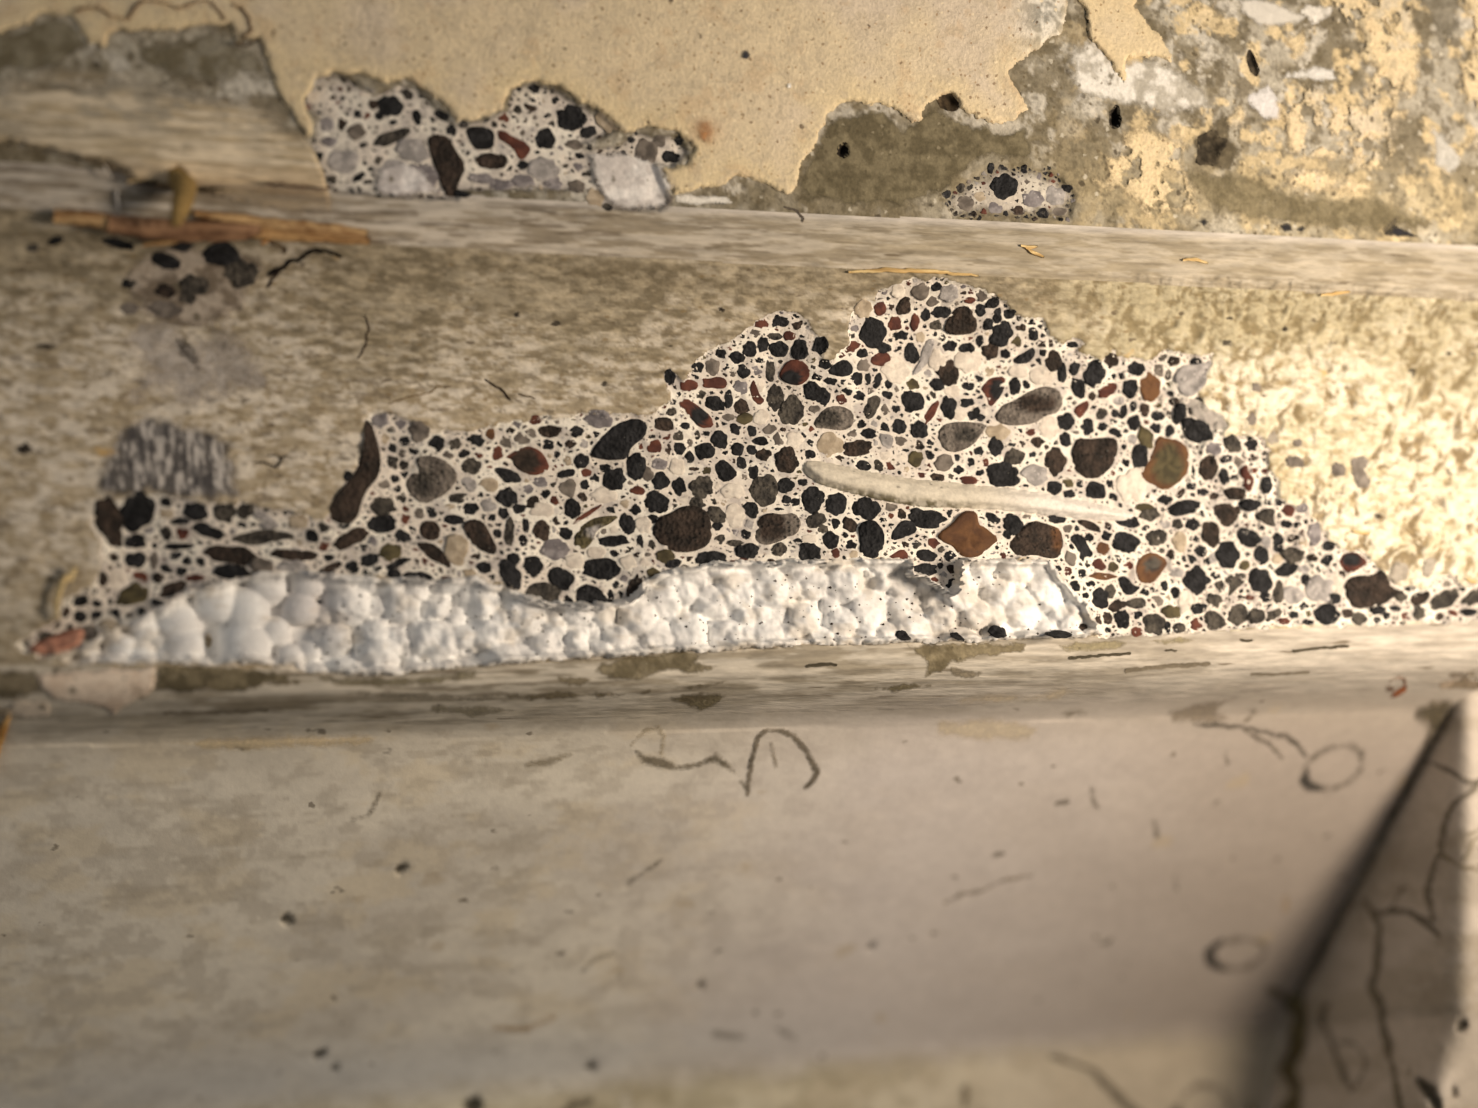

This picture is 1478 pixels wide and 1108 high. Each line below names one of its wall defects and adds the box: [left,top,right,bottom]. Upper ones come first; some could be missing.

flaking render [0,0,1172,211]
spalling [1247,50,1260,77]
flaking render [1283,0,1421,193]
flaking render [1460,0,1478,108]
spalling [26,235,64,252]
spalling [101,237,261,327]
spalling [942,163,1075,222]
flaking render [1098,105,1245,216]
spalling [8,276,1478,719]
damp [1063,640,1124,651]
crack [1317,764,1478,1108]